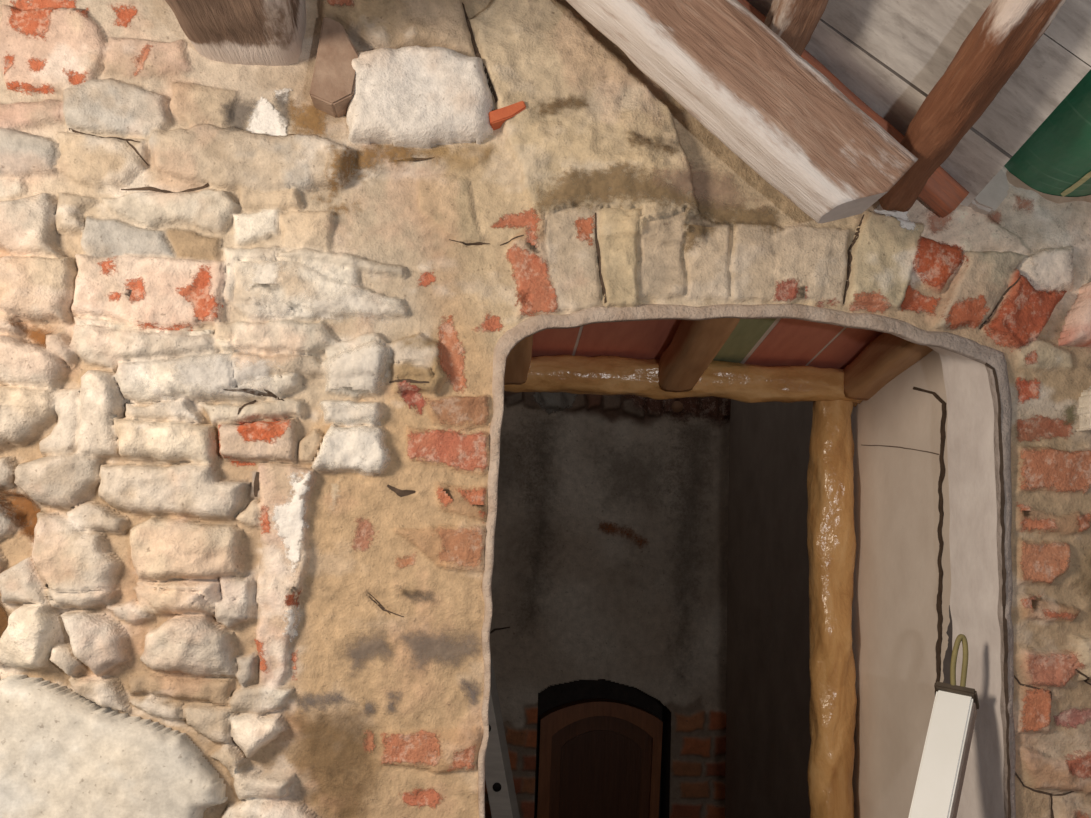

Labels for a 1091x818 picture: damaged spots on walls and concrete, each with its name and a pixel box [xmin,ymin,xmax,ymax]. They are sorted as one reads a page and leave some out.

crack [462,3,498,102]
water stain [539,97,588,115]
water stain [628,134,676,154]
water stain [537,163,782,250]
crack [843,214,865,304]
crack [863,387,946,696]
crack [985,363,1074,818]